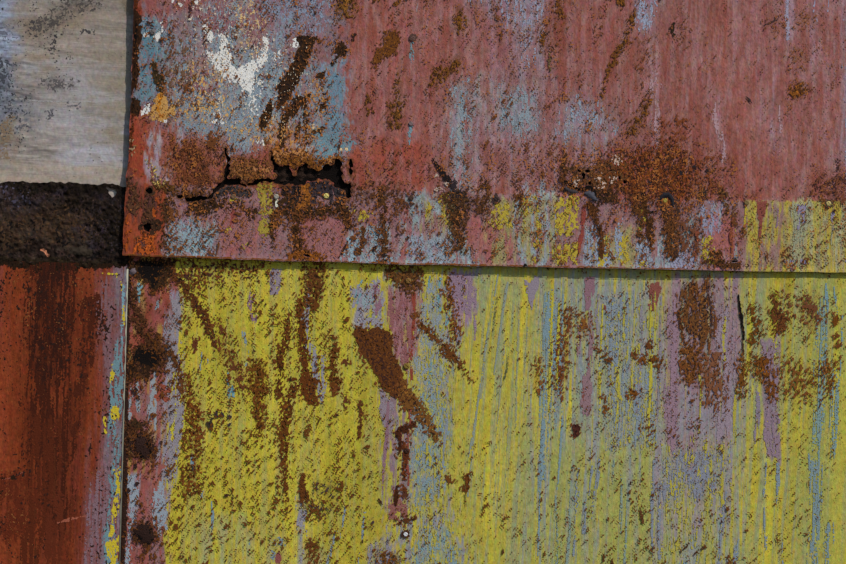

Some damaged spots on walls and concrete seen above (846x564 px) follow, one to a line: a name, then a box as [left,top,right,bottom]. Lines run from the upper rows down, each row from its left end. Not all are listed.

peeling [134,0,335,164]
corrosion [764,433,833,561]